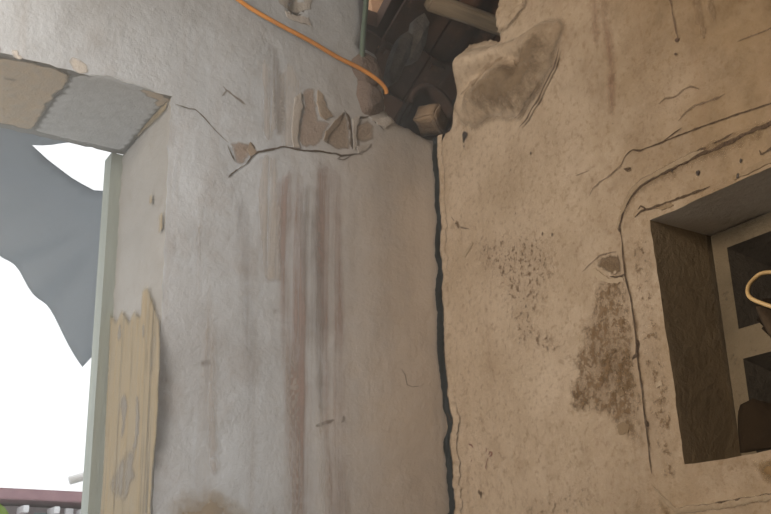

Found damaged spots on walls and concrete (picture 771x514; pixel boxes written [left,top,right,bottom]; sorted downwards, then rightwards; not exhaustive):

flaking render [279,0,312,26]
spalling [368,0,383,12]
peeling [0,50,87,129]
peeling [137,90,169,135]
spalling [232,143,257,163]
crack [176,104,359,177]
spalling [291,89,395,153]
crack [615,86,771,514]
peeling [100,288,160,514]